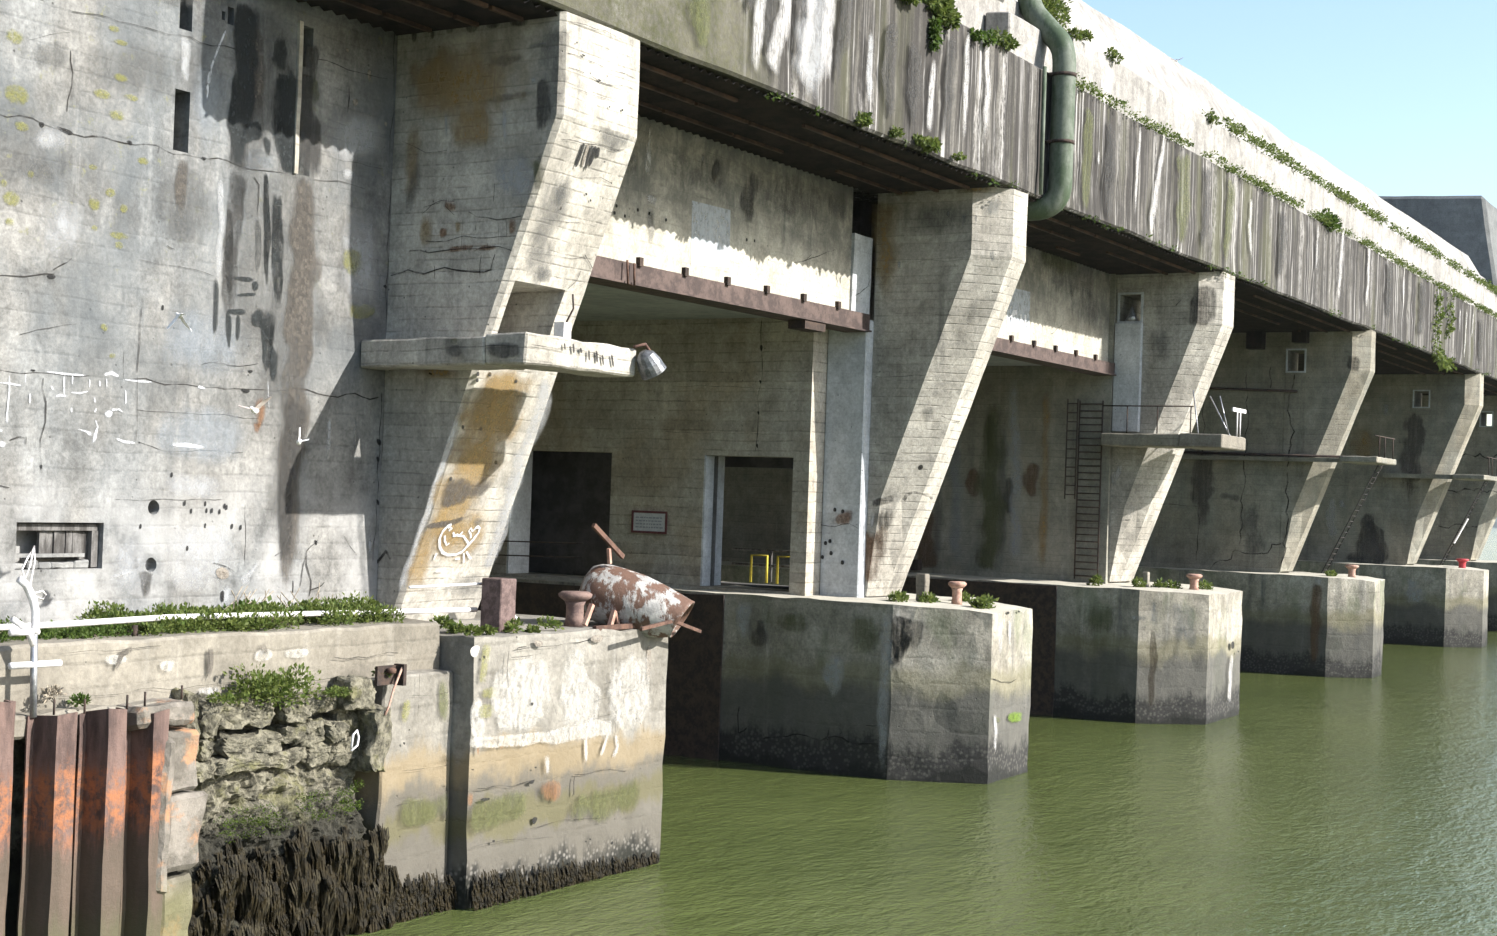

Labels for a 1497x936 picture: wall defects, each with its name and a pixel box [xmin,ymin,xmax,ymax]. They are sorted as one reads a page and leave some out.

water stain [748,0,852,81]
water stain [867,23,990,134]
crack [0,0,623,318]
water stain [179,5,321,579]
water stain [48,371,149,440]
crack [1129,367,1295,564]
water stain [1192,454,1235,518]
water stain [1347,514,1388,564]
water stain [857,616,923,745]